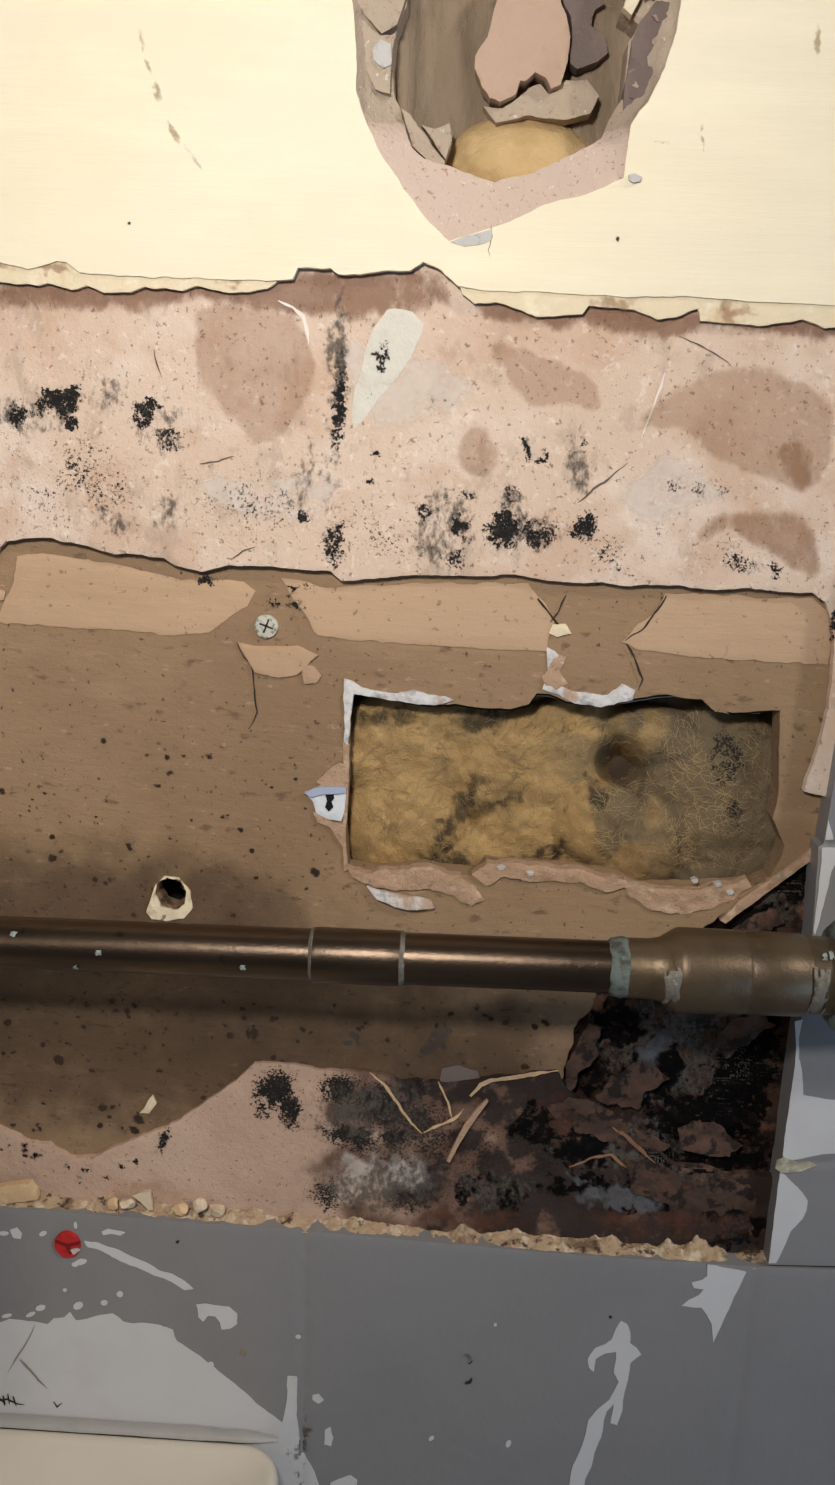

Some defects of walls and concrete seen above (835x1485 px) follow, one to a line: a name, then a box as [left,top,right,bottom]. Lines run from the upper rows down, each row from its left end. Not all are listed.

spalling [352,0,680,247]
peeling [0,262,278,293]
peeling [460,287,835,329]
damp [0,272,443,524]
damp [317,516,346,570]
mould [417,437,598,577]
damp [97,1104,144,1134]
damp [251,997,784,1216]
spalling [769,1020,835,1263]
damp [689,1210,767,1251]
spalling [0,1288,357,1485]
spalling [569,1321,641,1485]